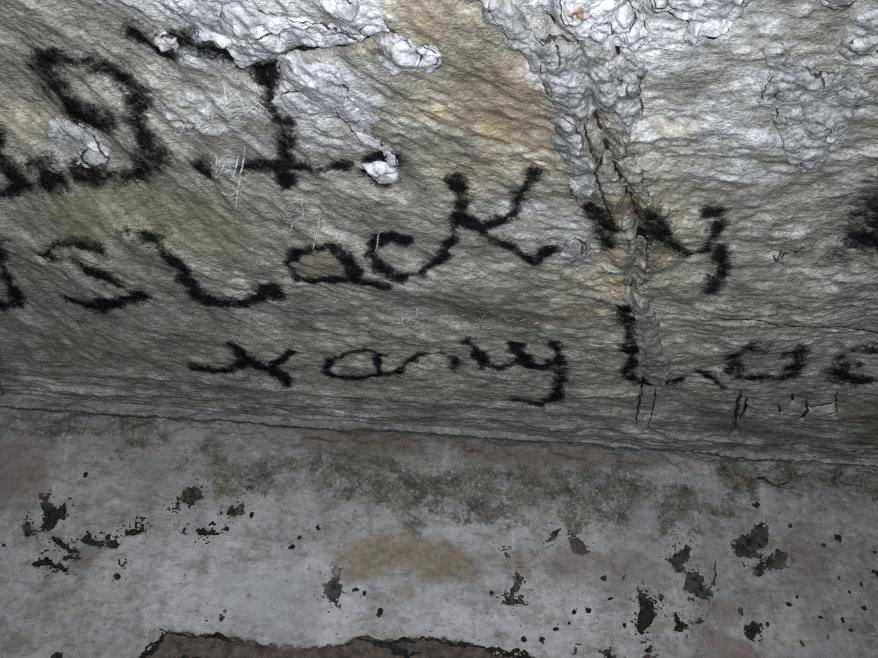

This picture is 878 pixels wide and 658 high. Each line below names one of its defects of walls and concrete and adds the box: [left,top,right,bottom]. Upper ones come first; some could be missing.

leakage [153,31,179,52]
leakage [159,0,445,185]
leakage [757,0,878,174]
leakage [46,118,111,168]
leakage [460,0,752,292]
crack [0,377,878,490]
peeling [13,487,151,581]
spalling [138,628,535,658]
peeling [314,557,366,613]
peeling [489,545,532,616]
peeling [622,540,719,658]
peeling [728,519,795,582]